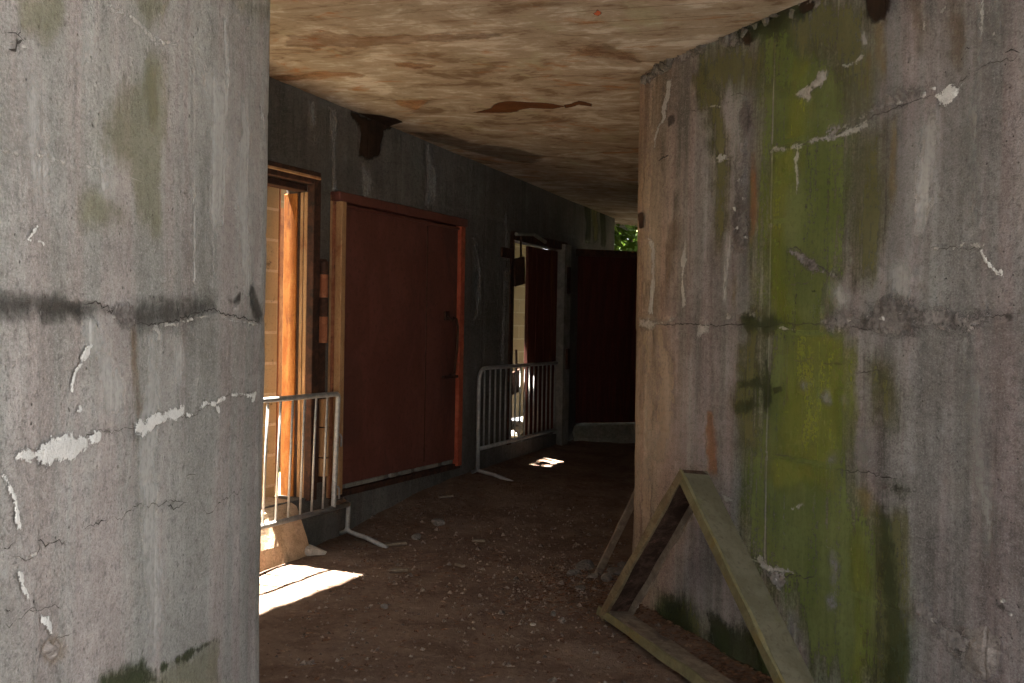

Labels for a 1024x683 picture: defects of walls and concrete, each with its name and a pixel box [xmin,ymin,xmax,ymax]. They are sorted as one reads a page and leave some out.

water stain [350,111,402,197]
water stain [474,101,592,113]
spalling [796,69,827,102]
crack [773,47,1019,190]
spalling [917,119,936,226]
spalling [935,84,963,107]
water stain [638,142,687,315]
crack [84,301,261,340]
crack [639,317,744,330]
crack [2,343,256,638]
water stain [873,505,913,683]